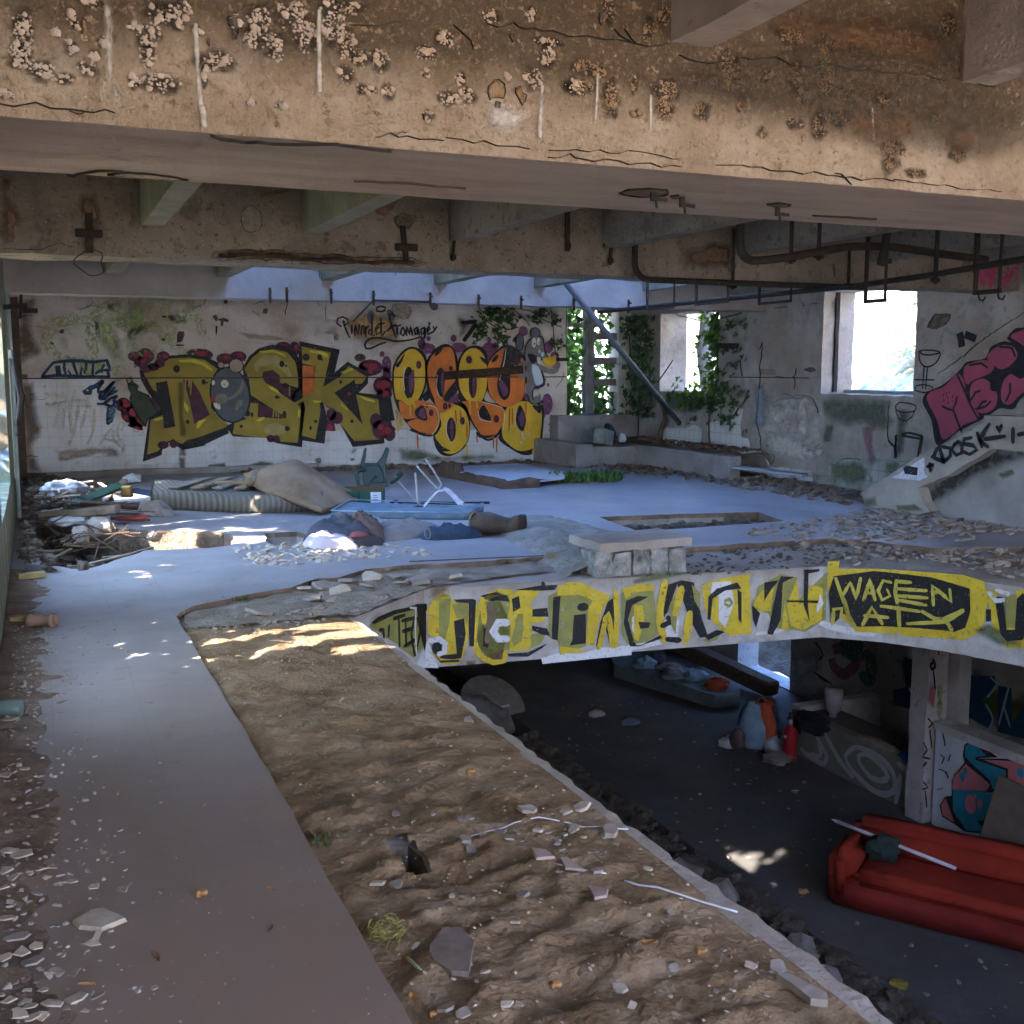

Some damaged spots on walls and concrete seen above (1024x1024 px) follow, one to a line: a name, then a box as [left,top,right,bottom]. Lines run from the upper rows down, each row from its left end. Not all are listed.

crack [453,22,994,88]
leakage [194,24,207,126]
leakage [698,30,1007,148]
crack [0,101,114,115]
leakage [490,109,522,126]
crack [210,131,680,168]
crack [720,165,1001,192]
spalling [211,248,426,267]